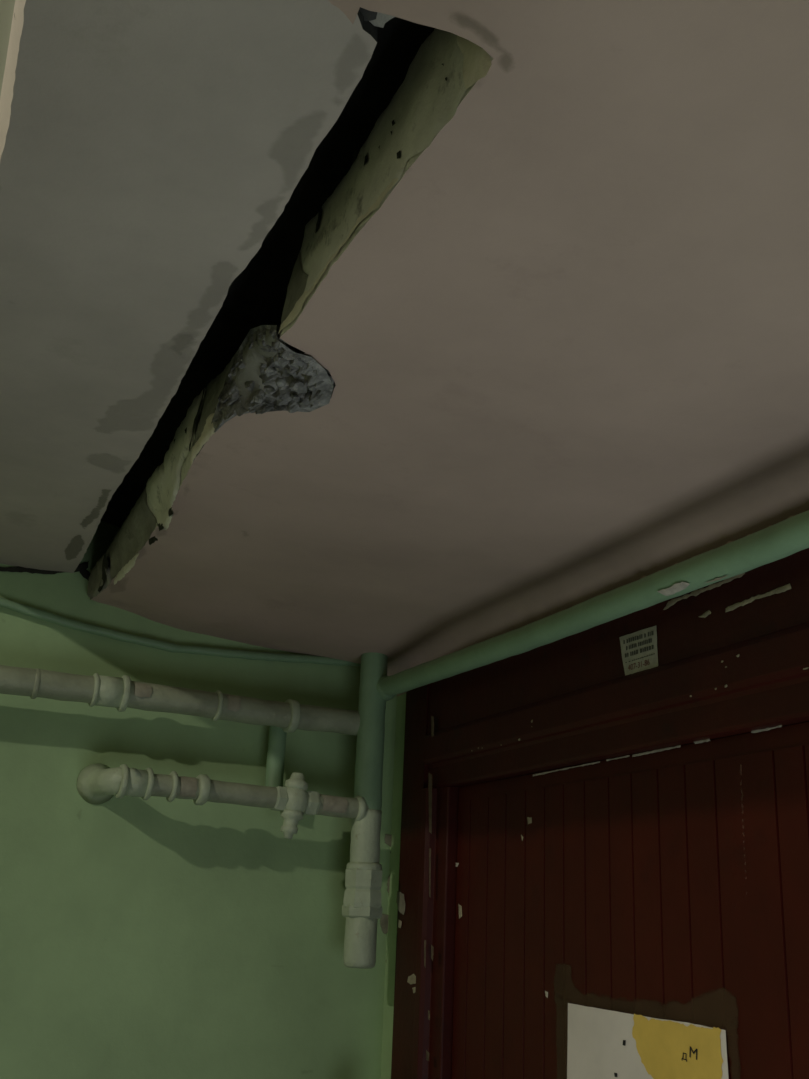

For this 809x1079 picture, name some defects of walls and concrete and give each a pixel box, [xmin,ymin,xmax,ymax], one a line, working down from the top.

crack [101,7,435,528]
peeling [87,28,492,597]